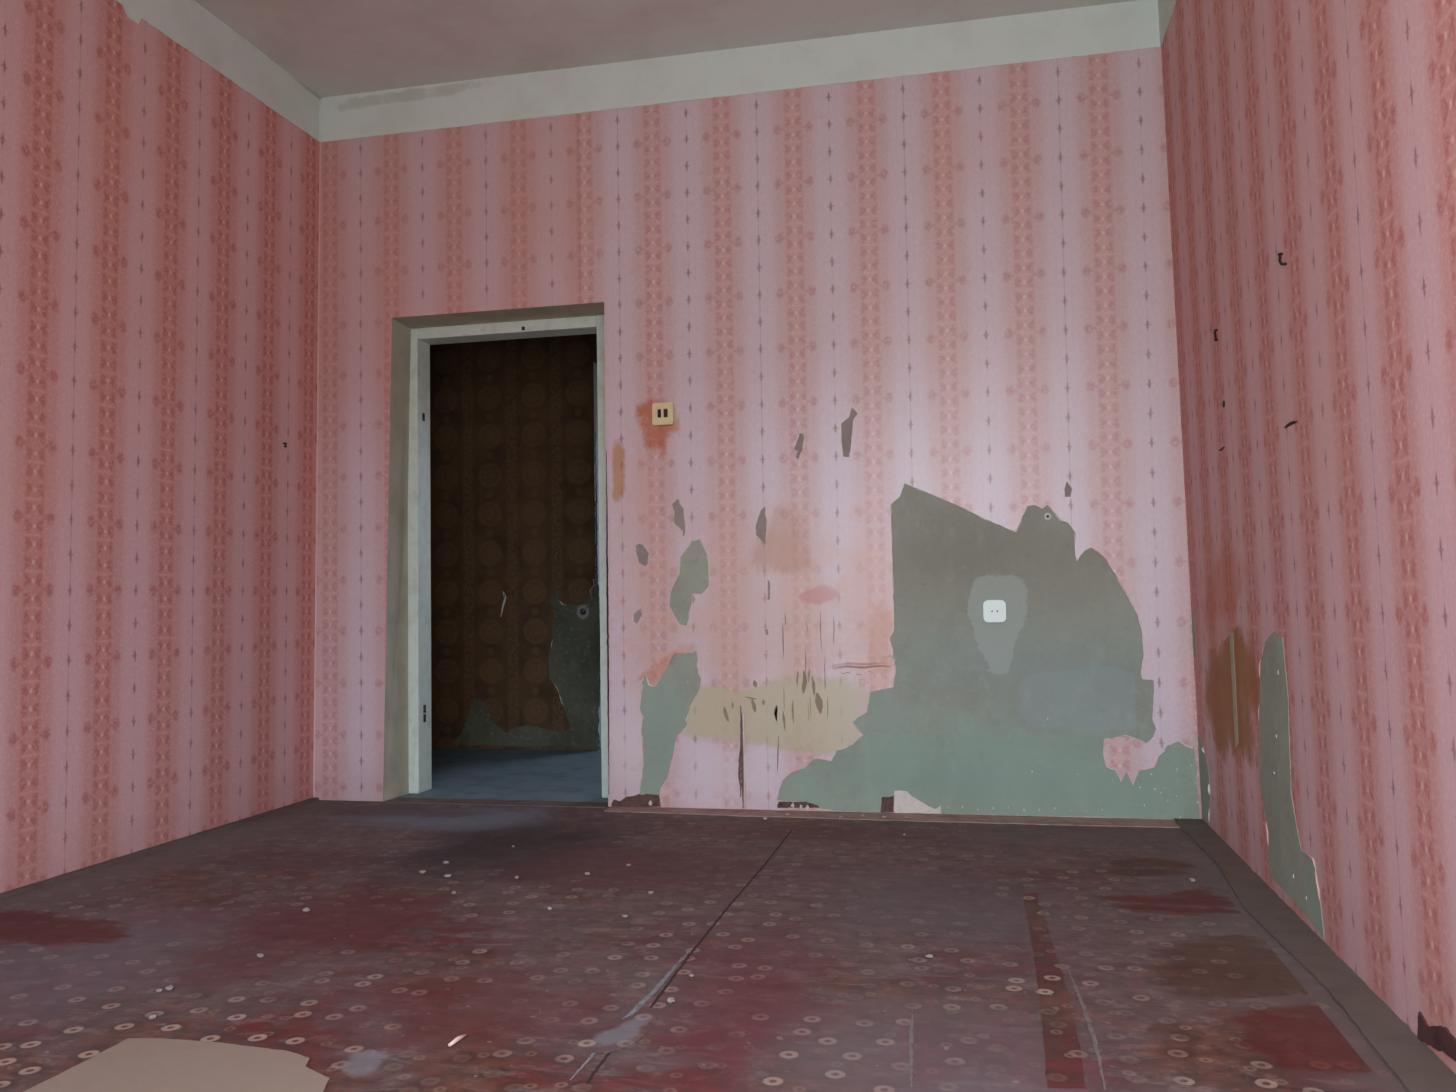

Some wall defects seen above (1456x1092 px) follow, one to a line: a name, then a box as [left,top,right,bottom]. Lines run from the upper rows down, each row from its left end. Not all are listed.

peeling [451,585,600,750]
peeling [611,647,702,807]
peeling [670,539,709,626]
peeling [777,483,1210,825]
water stain [1196,525,1270,789]
peeling [1258,632,1325,939]